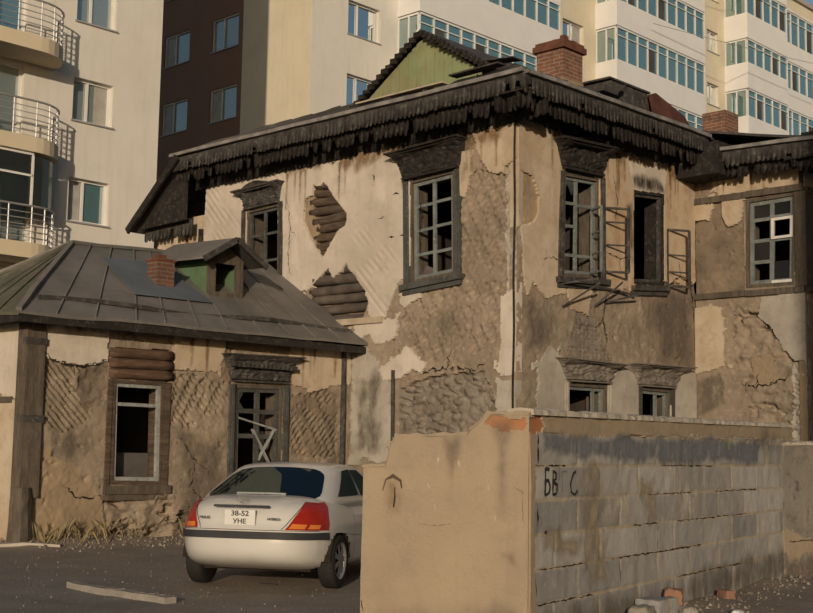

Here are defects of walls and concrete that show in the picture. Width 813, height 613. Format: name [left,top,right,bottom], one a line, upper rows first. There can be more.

flaking render [594,151,813,291]
flaking render [204,120,612,465]
flaking render [0,323,19,540]
crack [65,487,100,500]
flaking render [610,367,644,415]
spalling [670,291,813,441]
crack [741,374,789,388]